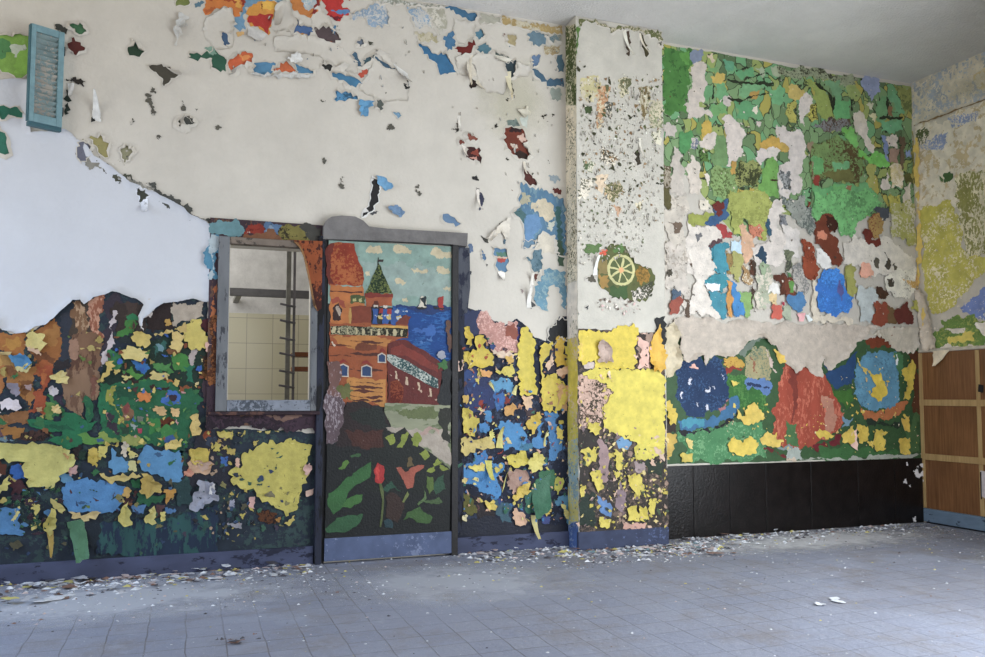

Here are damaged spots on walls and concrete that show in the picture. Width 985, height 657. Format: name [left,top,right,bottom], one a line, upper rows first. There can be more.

peeling [55,20,89,56]
peeling [0,32,315,563]
peeling [172,0,949,550]
crack [914,99,985,126]